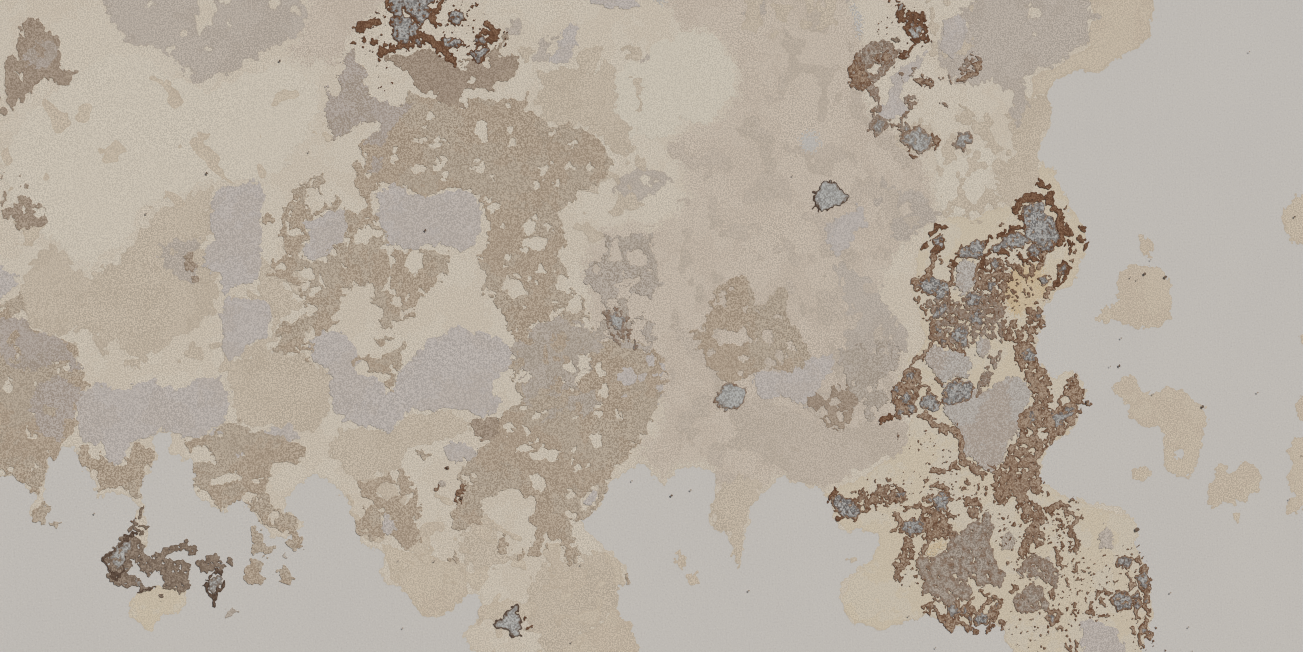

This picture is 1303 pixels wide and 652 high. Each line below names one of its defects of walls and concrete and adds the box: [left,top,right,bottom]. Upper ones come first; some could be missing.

rust [350,0,508,91]
rust [848,0,983,159]
rust [812,180,849,212]
peeling [0,0,1102,585]
rust [713,382,747,412]
rust [827,177,1166,652]
rust [101,506,233,607]
rust [493,604,533,638]
peeling [1079,618,1126,652]